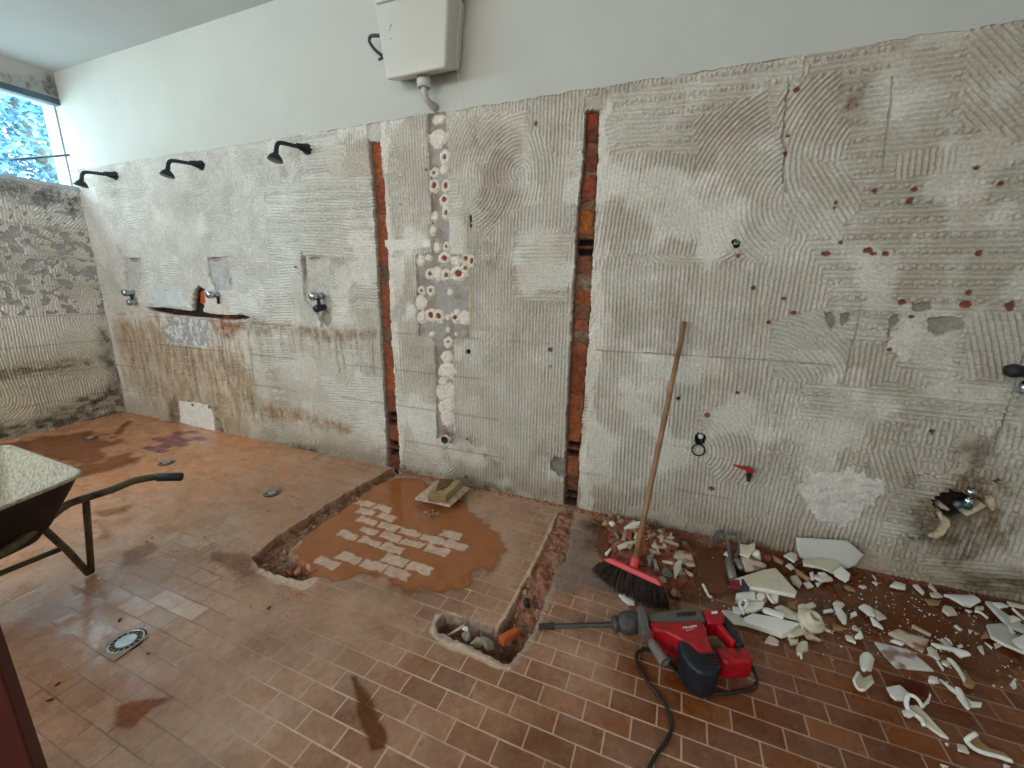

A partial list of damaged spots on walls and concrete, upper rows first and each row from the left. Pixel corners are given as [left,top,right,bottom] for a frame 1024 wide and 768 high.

spalling [823,311,851,329]
spalling [886,289,974,352]
spalling [925,478,1003,539]